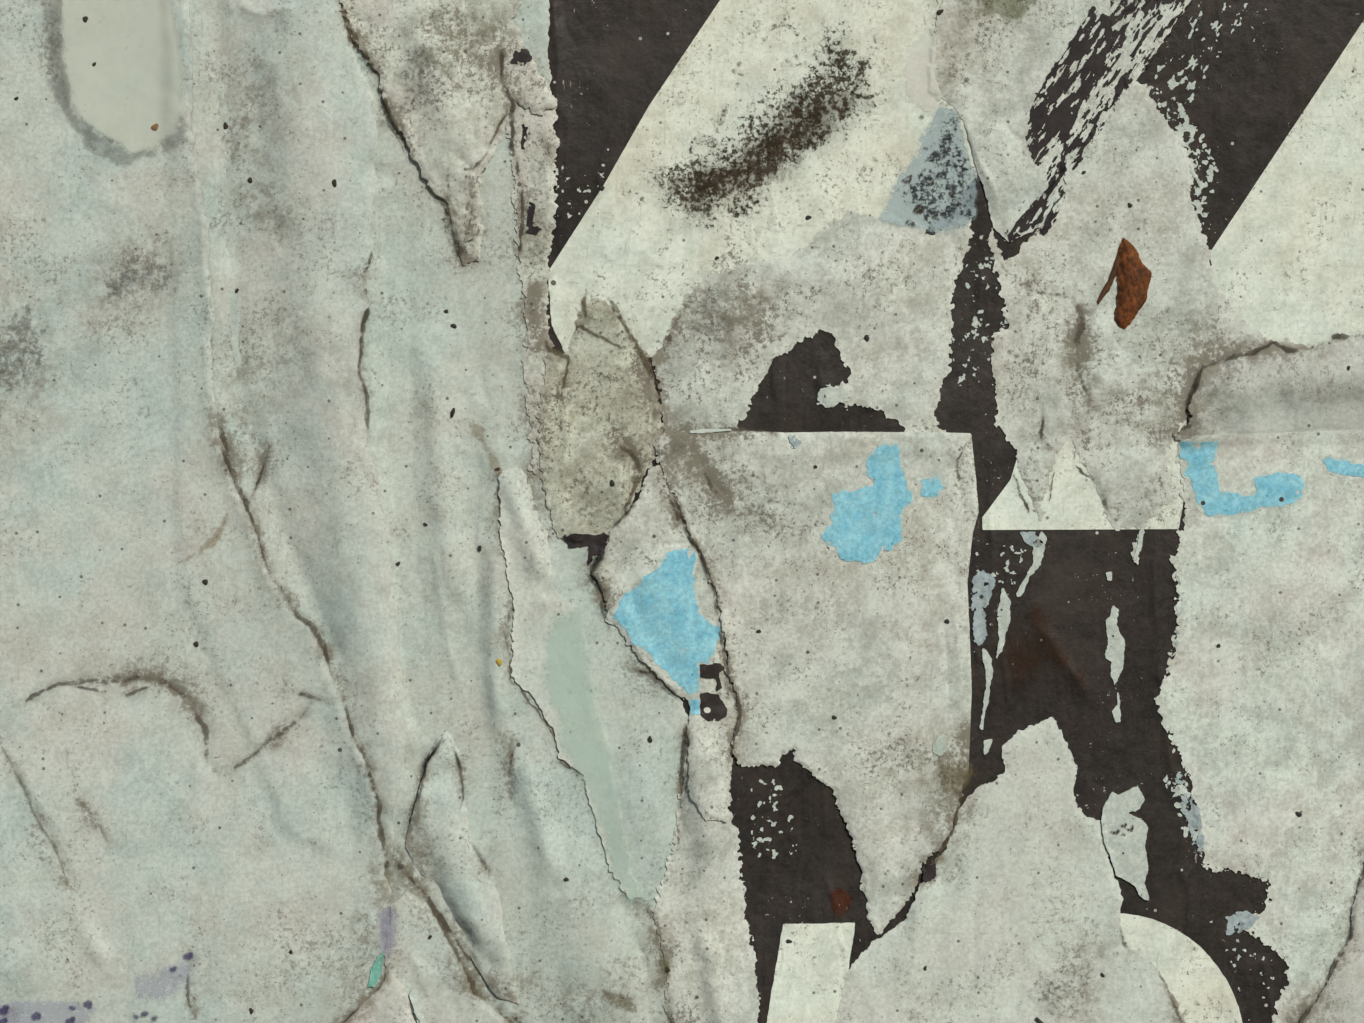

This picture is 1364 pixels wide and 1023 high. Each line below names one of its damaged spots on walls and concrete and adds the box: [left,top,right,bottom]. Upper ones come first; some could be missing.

mould [645,8,884,229]
crack [358,251,373,429]
crack [545,290,690,397]
crack [719,425,765,433]
crack [591,551,606,618]
crack [617,446,742,754]
crack [26,426,522,1023]
crack [504,606,569,768]
crack [678,725,688,843]
peeling [1101,785,1149,900]
peeling [1175,773,1205,853]
peeling [1225,911,1260,935]